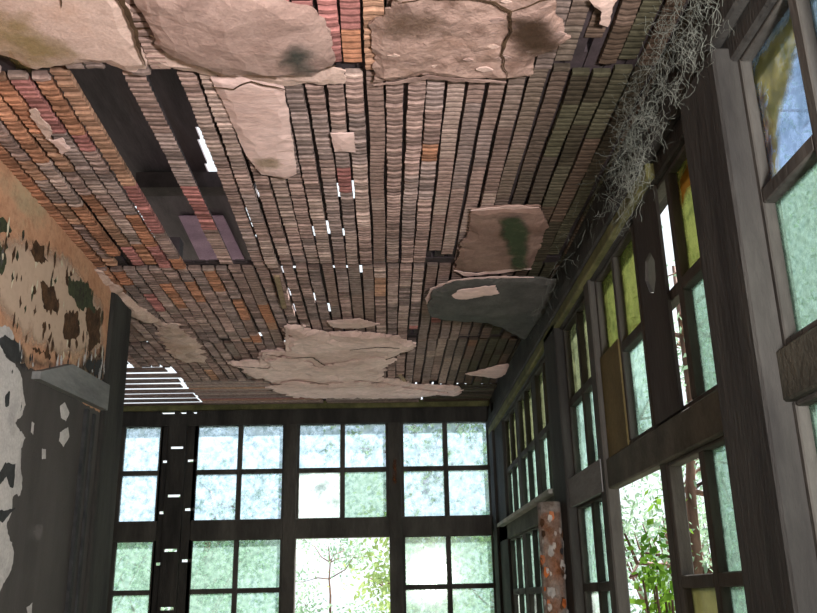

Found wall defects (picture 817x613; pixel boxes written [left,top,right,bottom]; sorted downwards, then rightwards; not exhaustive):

crack [118,0,155,66]
water stain [286,48,311,71]
crack [472,0,546,79]
peeling [590,0,617,27]
water stain [501,217,528,271]
spalling [425,269,534,304]
spalling [260,327,290,362]
peeling [0,217,105,590]